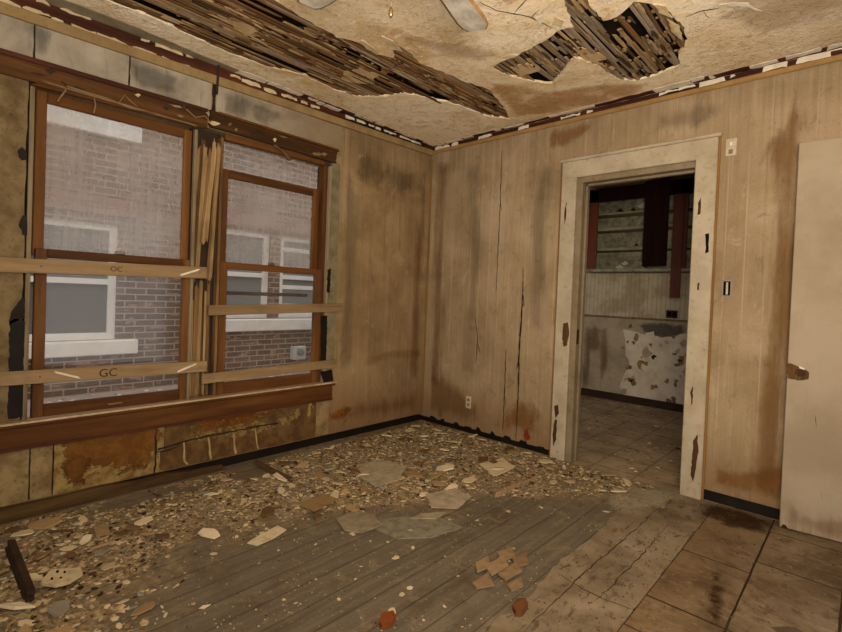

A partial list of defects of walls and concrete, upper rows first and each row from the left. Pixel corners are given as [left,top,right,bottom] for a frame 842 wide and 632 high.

peeling [0,0,195,66]
flaking render [111,0,529,150]
peeling [549,105,595,120]
flaking render [494,0,685,81]
peeling [653,74,735,96]
peeling [749,43,842,72]
peeling [620,324,693,405]
peeling [691,434,699,480]